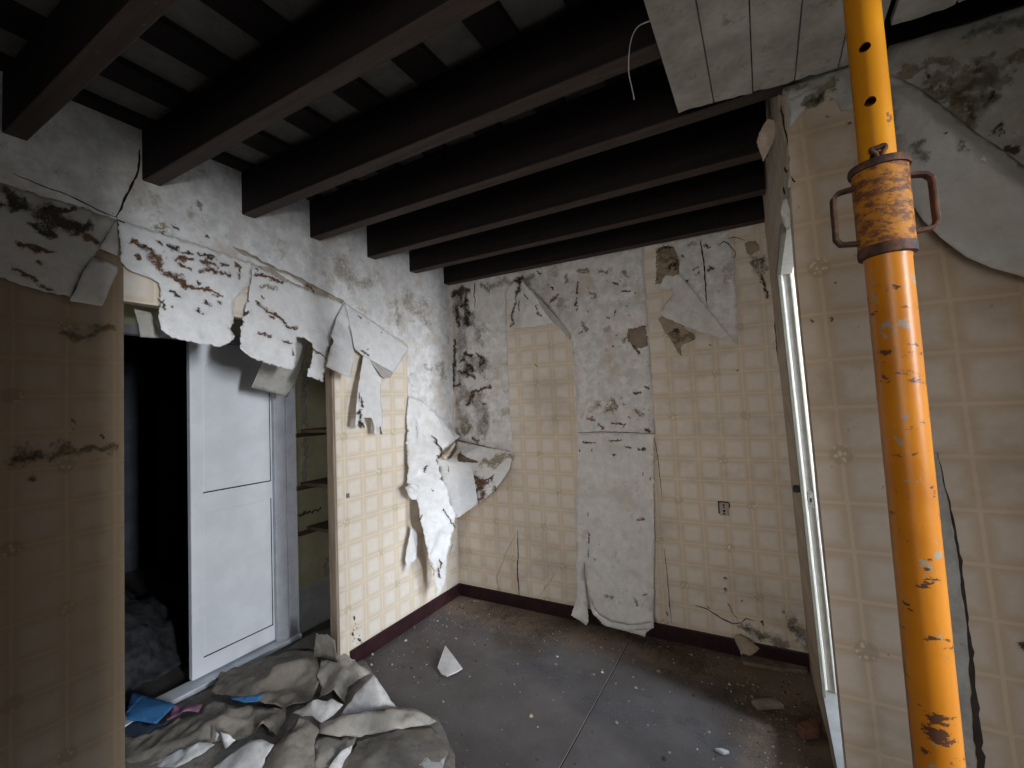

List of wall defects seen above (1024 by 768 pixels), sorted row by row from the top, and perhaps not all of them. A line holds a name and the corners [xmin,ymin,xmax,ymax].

flaking render [778,65,853,149]
flaking render [887,6,1024,165]
water stain [897,48,1024,130]
water stain [988,122,1020,155]
water stain [0,185,100,291]
crack [13,149,141,223]
flaking render [0,71,759,452]
flaking render [780,175,792,230]
water stain [451,284,490,327]
water stain [452,339,492,424]
water stain [10,434,118,466]
crack [937,452,986,768]